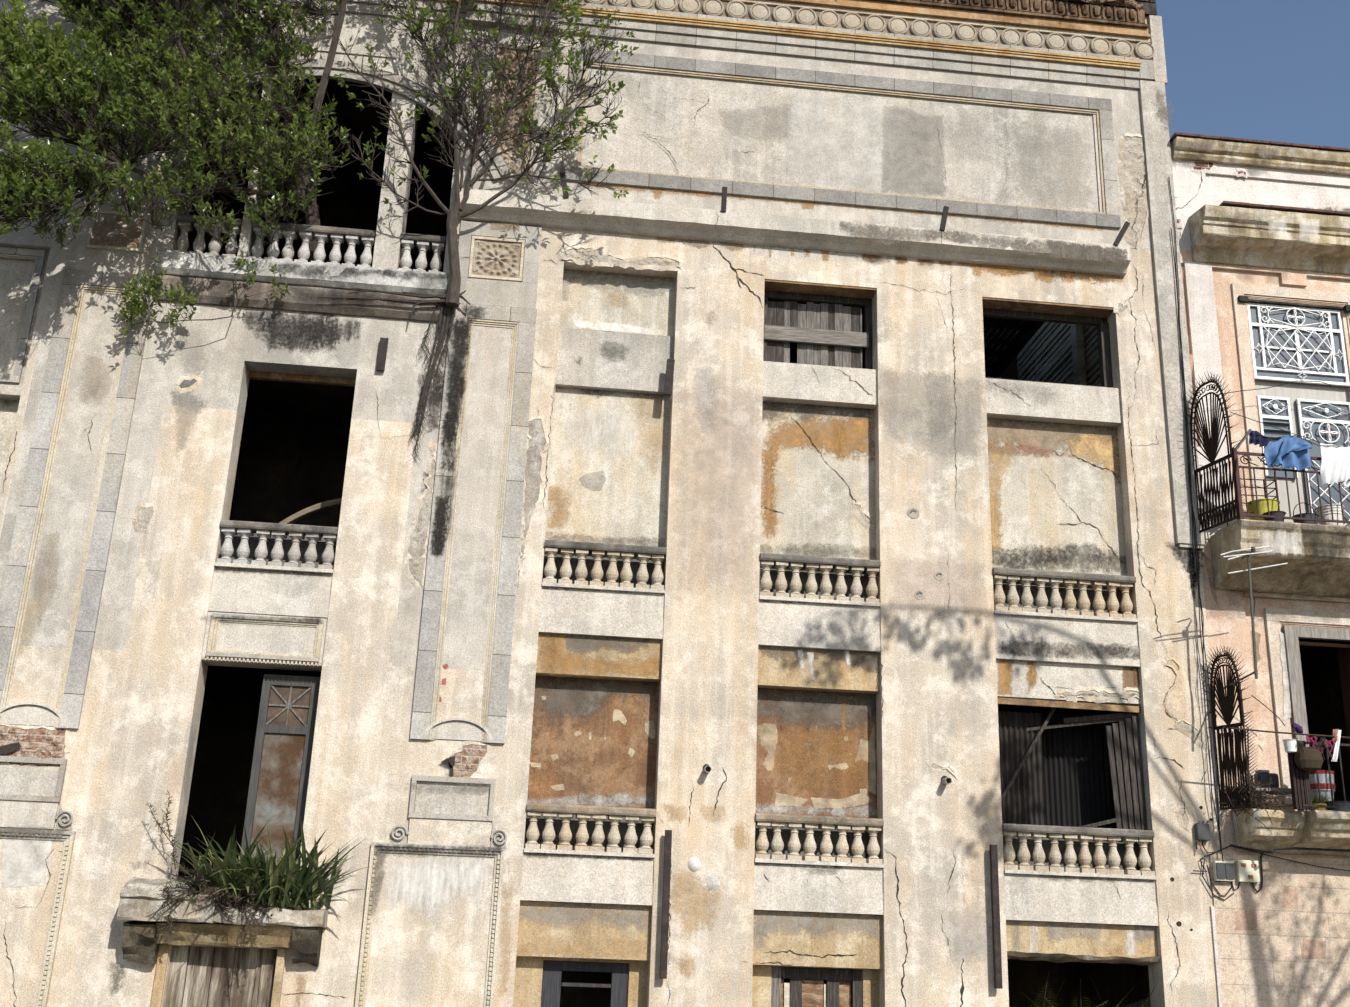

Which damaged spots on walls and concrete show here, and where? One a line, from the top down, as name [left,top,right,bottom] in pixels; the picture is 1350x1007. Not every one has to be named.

crack [712,214,762,305]
damp [246,264,402,349]
damp [412,307,481,556]
crack [1041,150,1203,634]
damp [992,545,1126,570]
spalling [0,724,72,771]
spalling [438,740,492,785]
peeling [613,709,627,725]
peeling [757,723,778,771]
peeling [775,724,876,809]
crack [885,849,908,1004]
crack [942,850,964,1007]